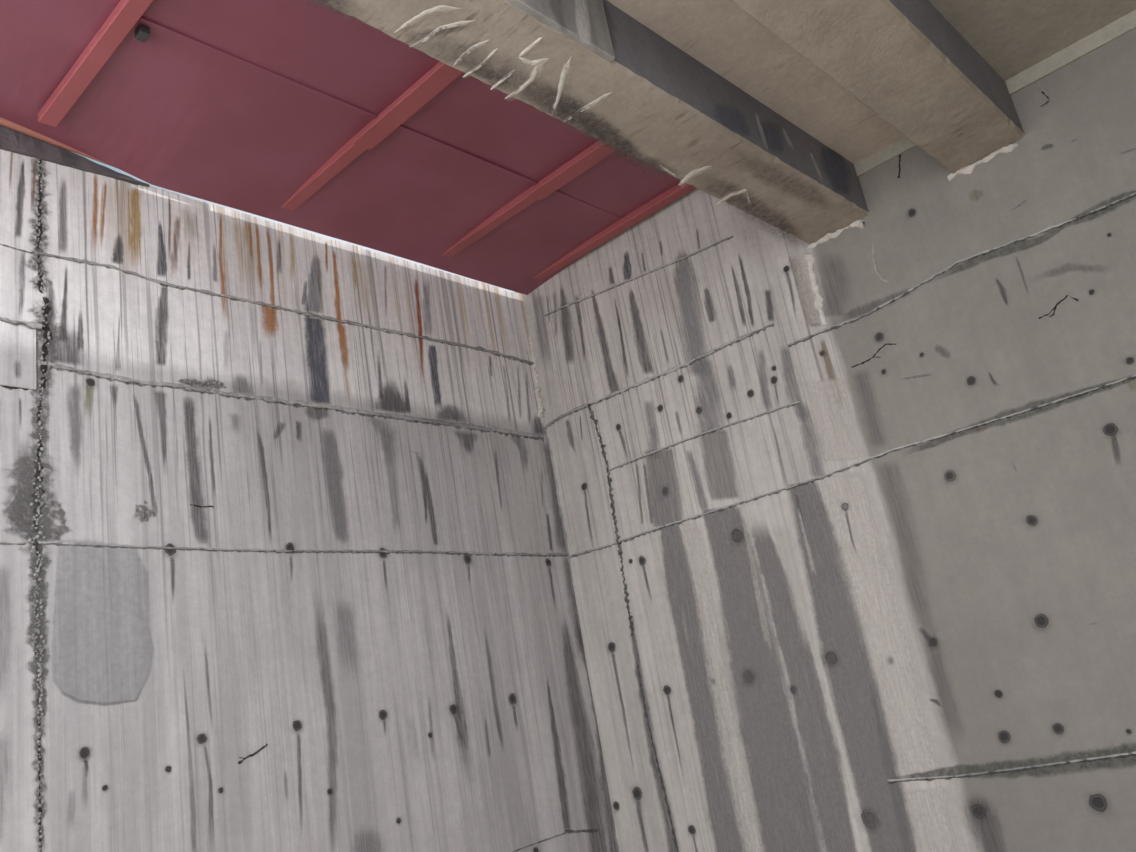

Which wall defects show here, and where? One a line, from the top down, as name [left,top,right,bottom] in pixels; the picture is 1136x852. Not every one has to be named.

corrosion [93,178,106,235]
corrosion [128,191,140,251]
corrosion [168,201,179,259]
corrosion [249,224,274,332]
corrosion [325,244,347,365]
corrosion [415,281,423,363]
crack [588,404,634,636]
crack [637,663,678,851]